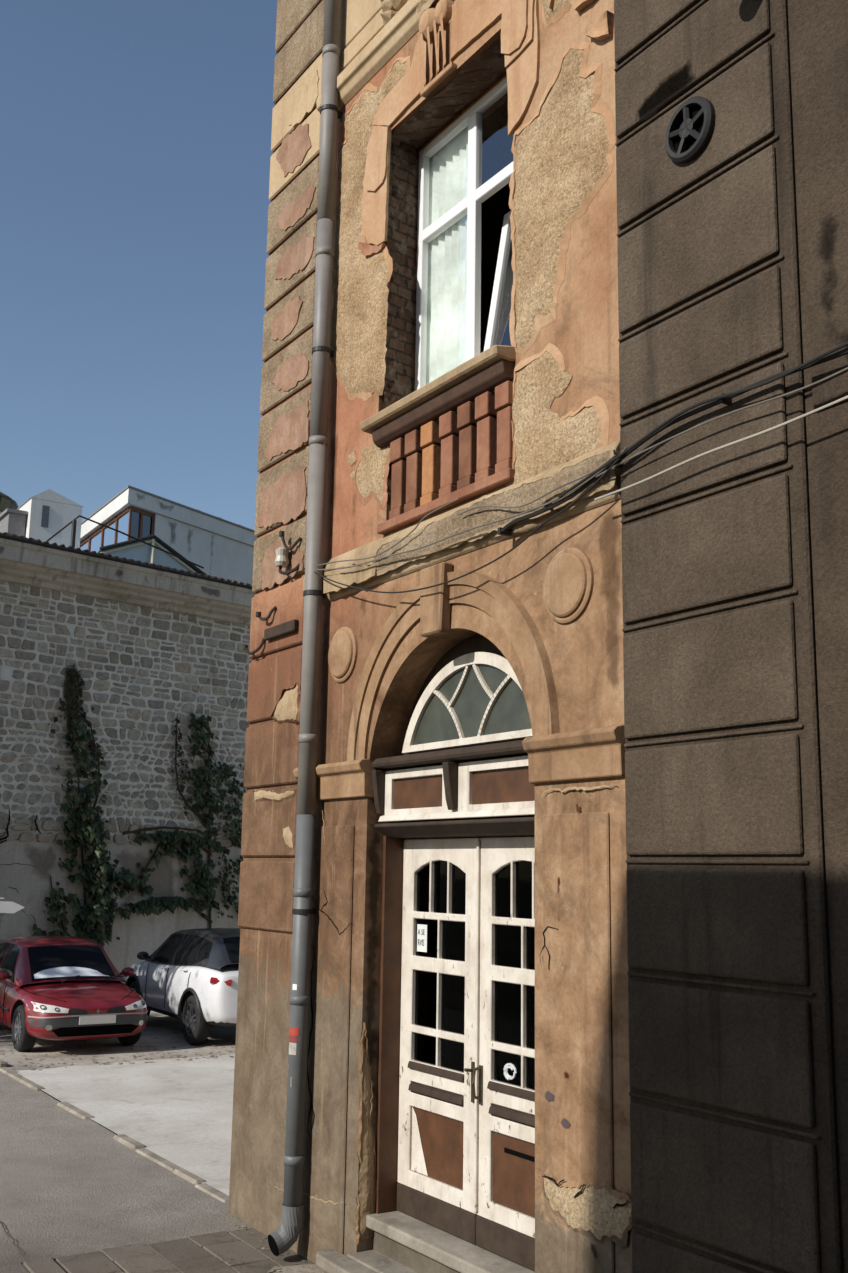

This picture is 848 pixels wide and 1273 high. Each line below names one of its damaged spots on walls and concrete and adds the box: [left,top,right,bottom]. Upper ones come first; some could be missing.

spalling [416,0,434,16]
spalling [538,0,595,28]
peeling [276,70,319,178]
peeling [271,296,303,341]
spalling [323,10,616,594]
peeling [272,353,309,391]
peeling [264,401,310,461]
peeling [258,466,307,590]
spalling [542,1169,632,1247]